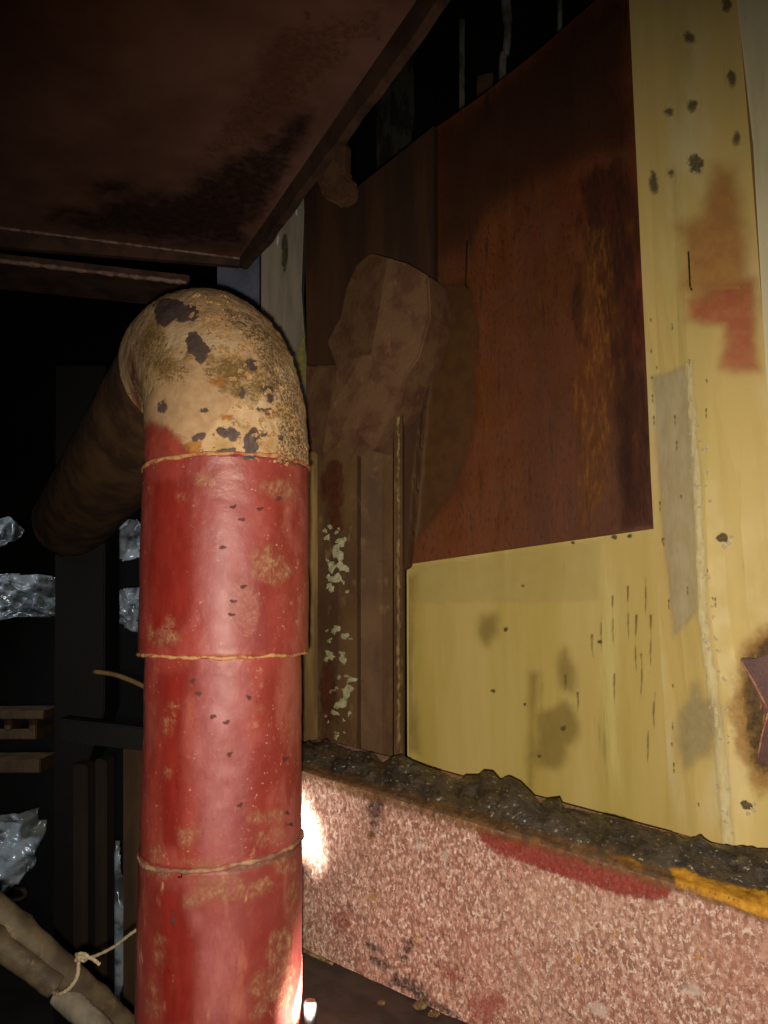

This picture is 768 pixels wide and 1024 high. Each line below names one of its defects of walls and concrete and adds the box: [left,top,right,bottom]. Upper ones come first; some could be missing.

peeling [153,291,296,460]
corrosion [581,166,651,526]
peeling [322,524,349,593]
peeling [323,625,358,740]
water stain [541,706,574,764]
corrosion [734,634,768,787]